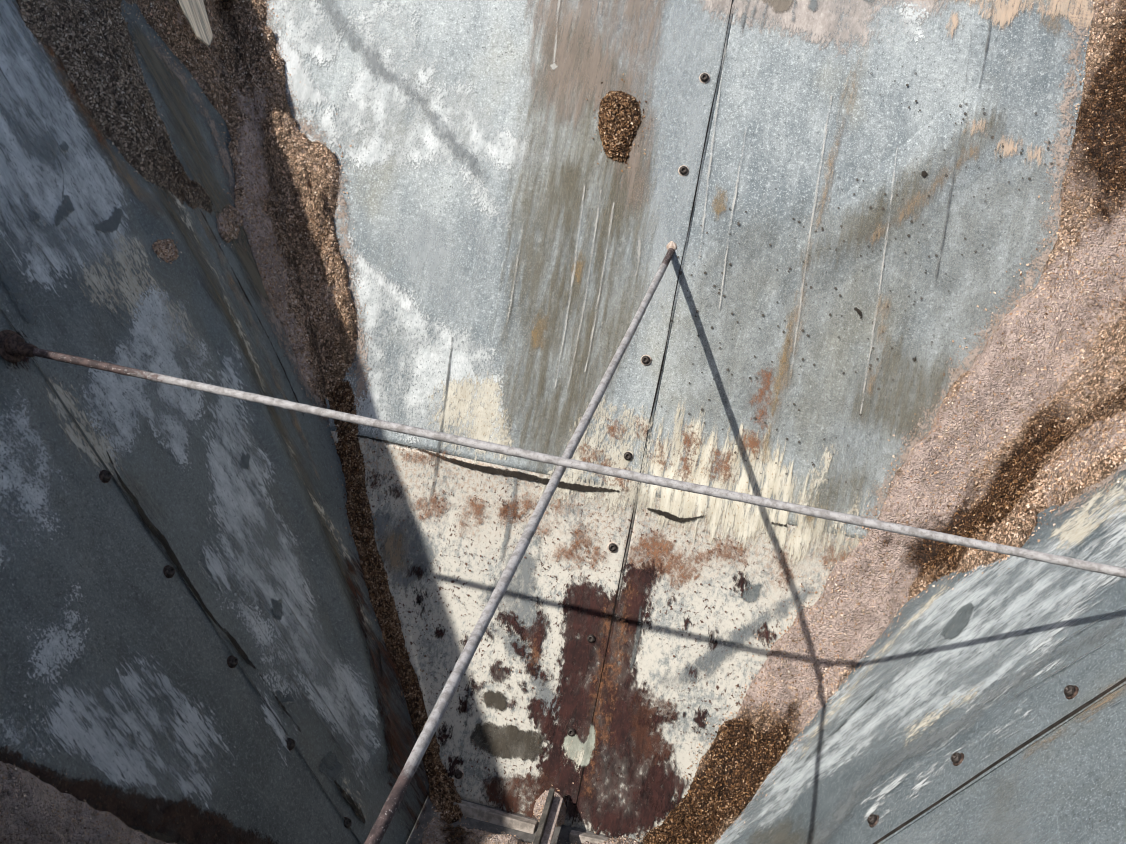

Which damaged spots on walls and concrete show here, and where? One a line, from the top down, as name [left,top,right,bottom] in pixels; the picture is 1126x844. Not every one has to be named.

damp [506,0,665,464]
rust [35,35,430,831]
rust [367,452,452,546]
rust [398,476,539,670]
rust [435,500,805,840]
rust [752,369,778,430]
rust [823,545,850,568]
rust [0,745,278,844]